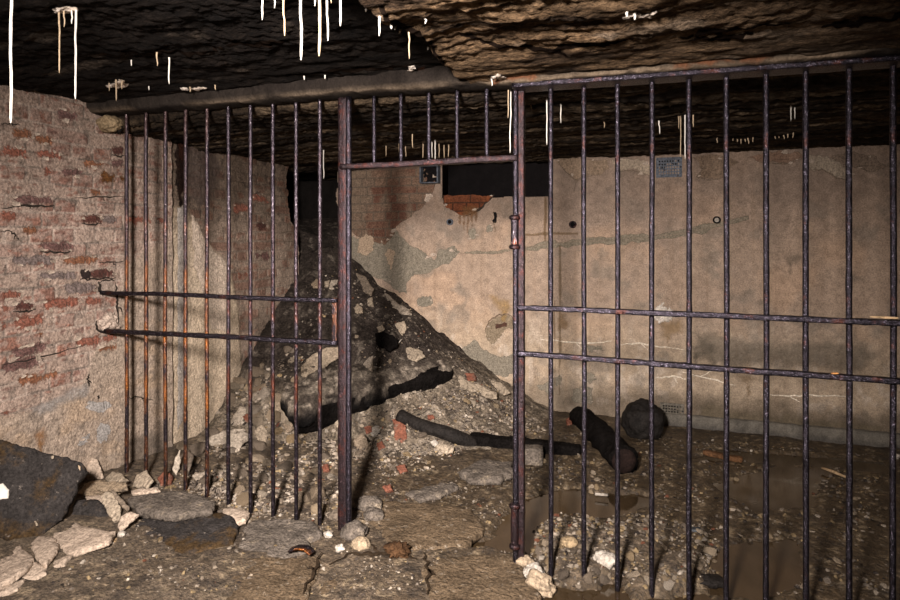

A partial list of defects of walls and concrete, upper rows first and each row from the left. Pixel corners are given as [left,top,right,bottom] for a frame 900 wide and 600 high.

leakage [52,6,77,14]
flaking render [352,167,494,293]